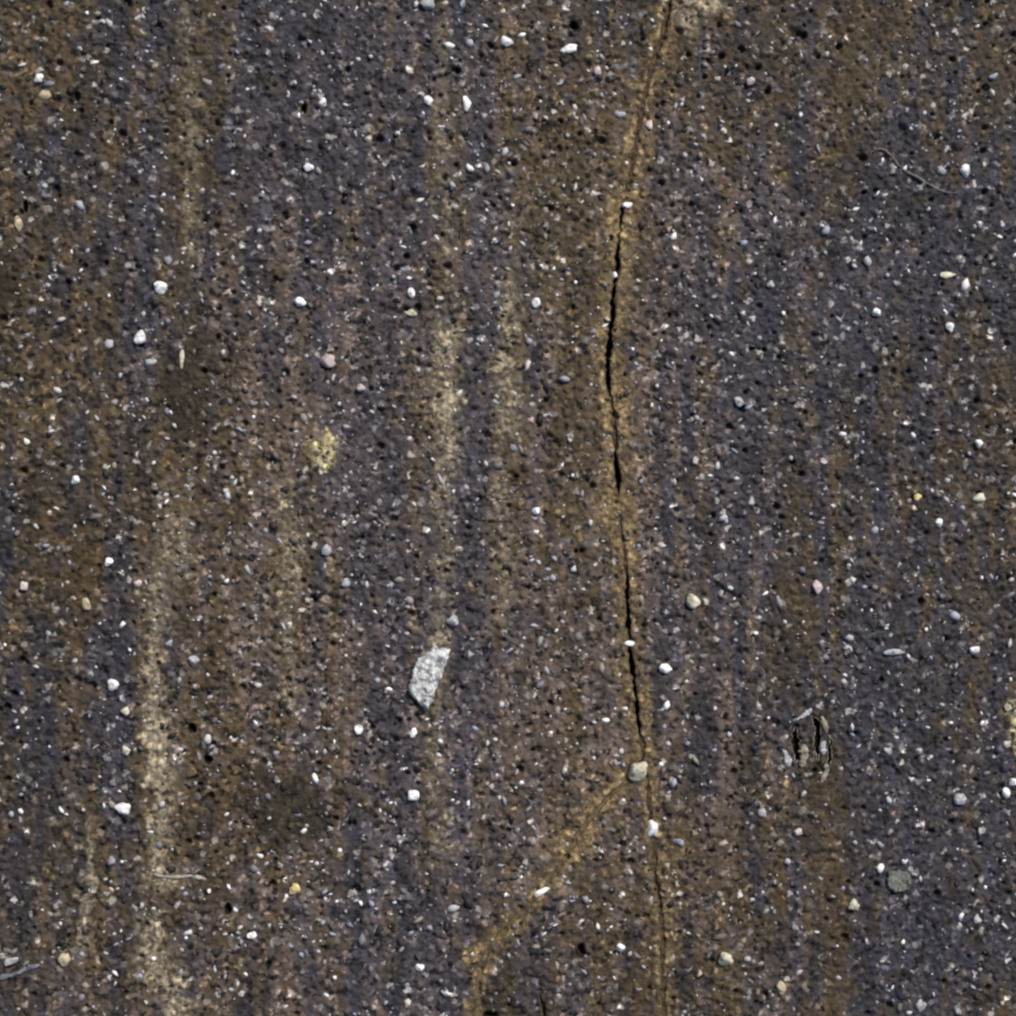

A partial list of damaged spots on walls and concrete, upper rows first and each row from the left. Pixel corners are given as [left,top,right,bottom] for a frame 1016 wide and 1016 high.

crack [467,0,673,1016]